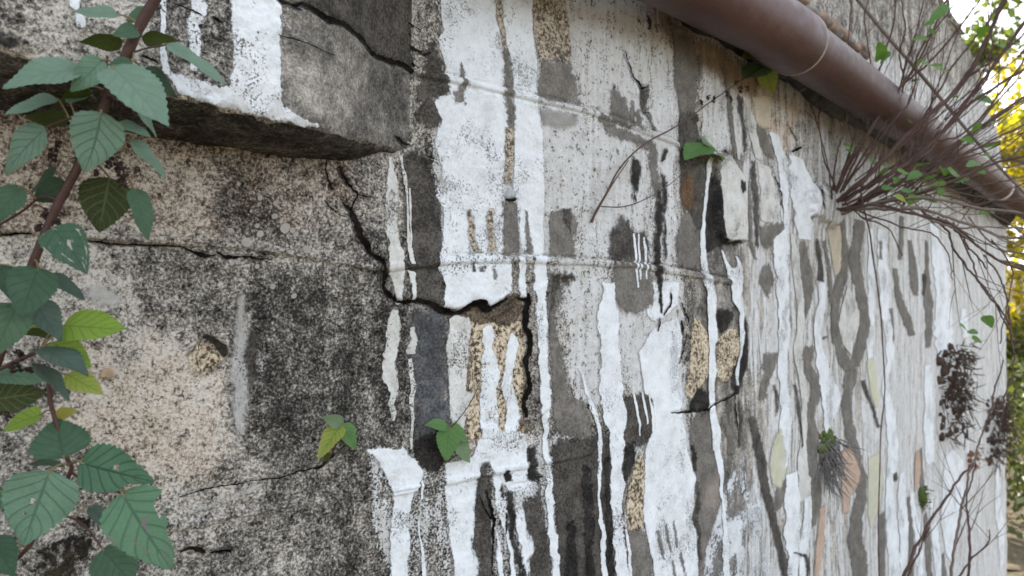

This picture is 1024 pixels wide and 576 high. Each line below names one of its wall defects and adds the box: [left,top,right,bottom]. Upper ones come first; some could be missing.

crack [278,0,431,72]
crack [0,230,32,238]
crack [88,240,271,260]
crack [324,162,533,418]
leakage [302,0,947,576]
spalling [188,334,228,376]
spalling [445,293,526,444]
spalling [685,316,741,398]
crack [179,454,336,497]